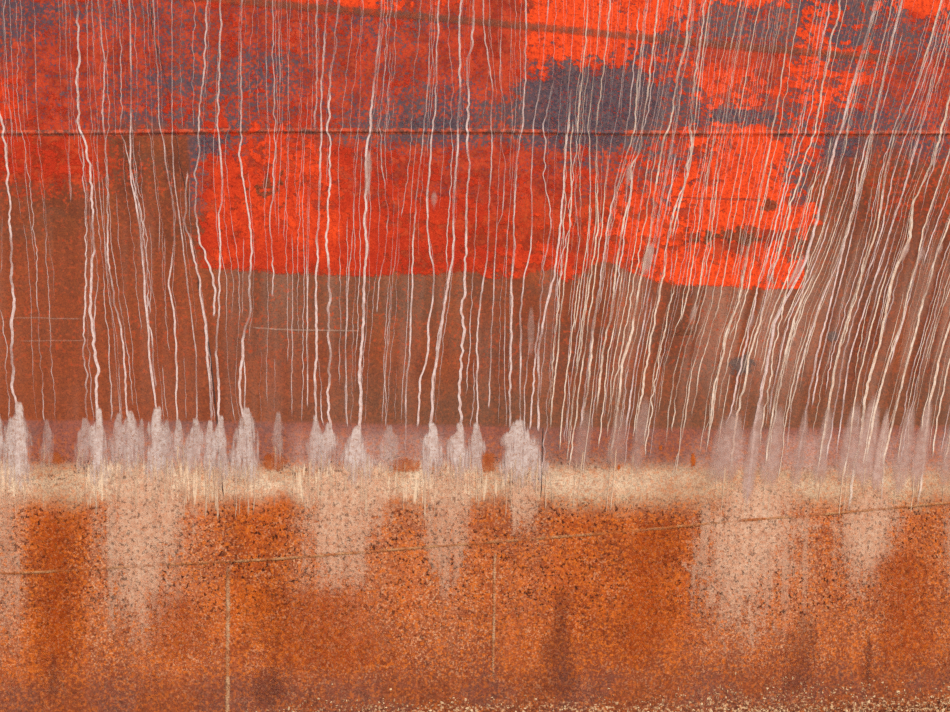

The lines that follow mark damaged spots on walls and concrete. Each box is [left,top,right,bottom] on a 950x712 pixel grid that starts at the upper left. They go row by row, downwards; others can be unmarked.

damp [0,112,17,242]
damp [0,264,29,630]
damp [24,145,50,320]
damp [75,0,258,643]
damp [265,16,396,594]
damp [401,0,950,647]